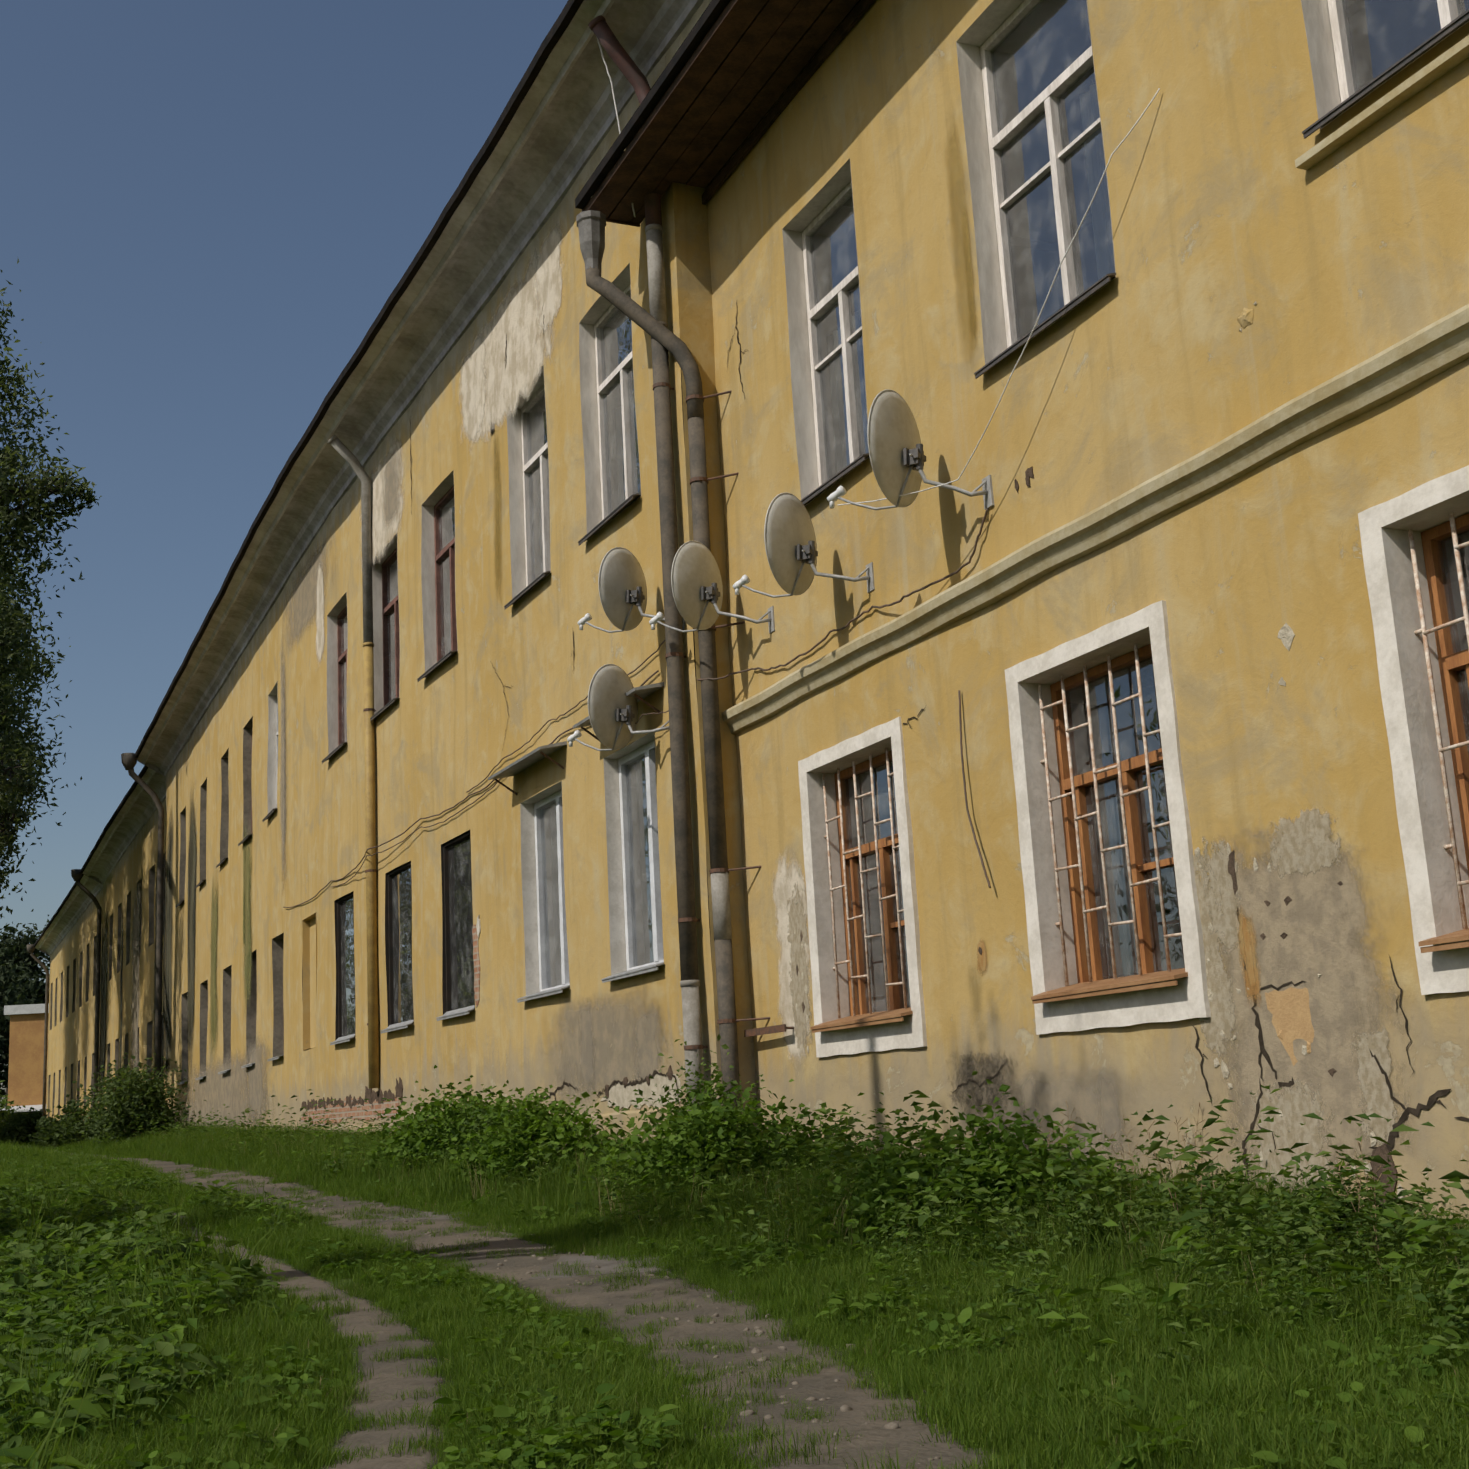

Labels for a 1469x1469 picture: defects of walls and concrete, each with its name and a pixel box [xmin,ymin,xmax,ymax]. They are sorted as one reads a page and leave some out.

flaking render [301,1077,403,1126]
flaking render [596,1065,682,1110]
water stain [950,1054,1120,1161]
crack [1192,1025,1212,1104]
crack [1236,907,1295,1185]
flaking render [1193,808,1406,1195]
crack [1369,956,1469,1152]